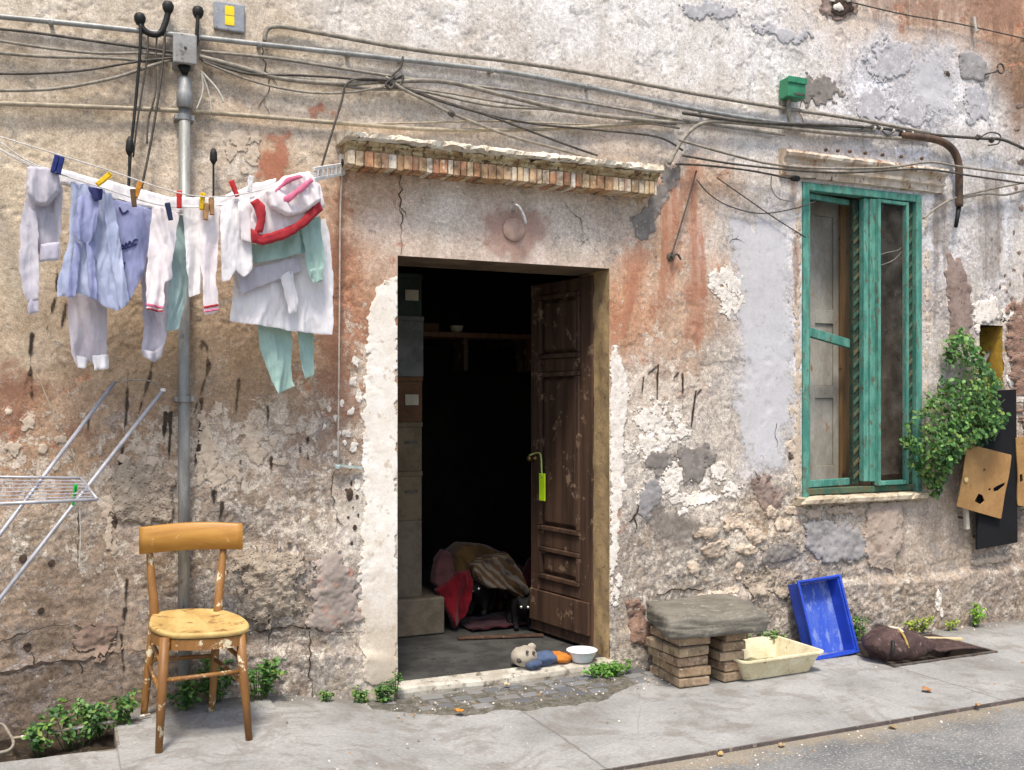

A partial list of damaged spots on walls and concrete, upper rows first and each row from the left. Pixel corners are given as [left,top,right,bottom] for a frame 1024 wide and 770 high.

spalling [678,0,815,45]
spalling [803,32,913,121]
spalling [963,82,991,125]
crack [398,175,406,254]
spalling [630,163,681,241]
peeling [708,265,746,320]
peeling [322,276,398,686]
peeling [609,345,783,647]
peeling [935,589,943,618]